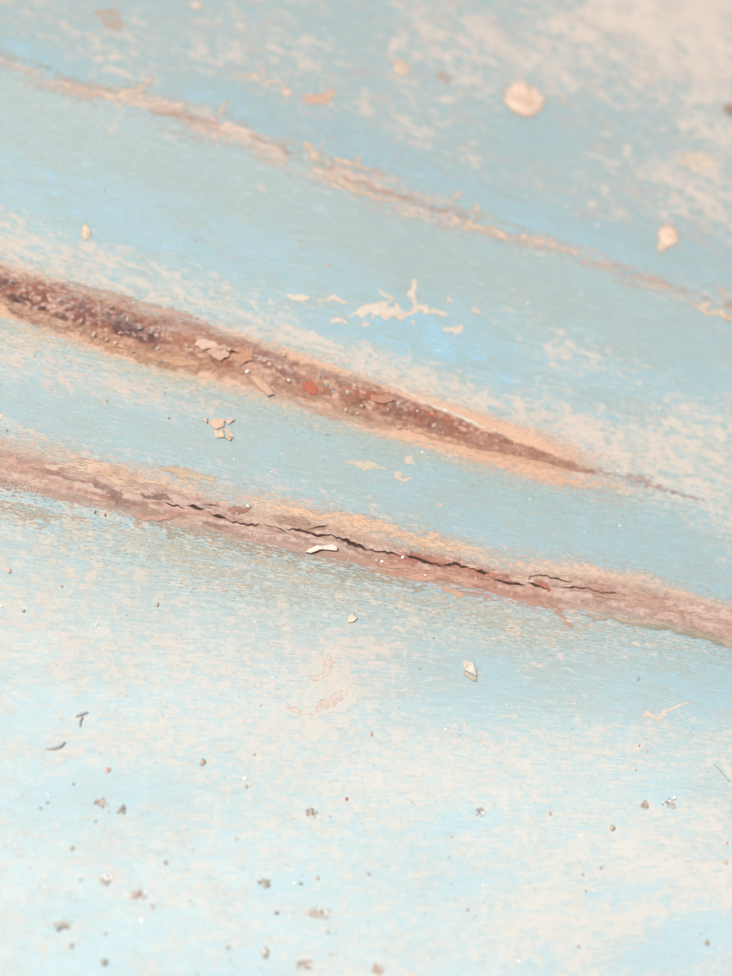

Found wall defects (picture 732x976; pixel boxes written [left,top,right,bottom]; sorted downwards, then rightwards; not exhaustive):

peeling [232,69,338,108]
rust [0,49,732,322]
rust [0,247,704,515]
peeling [285,279,463,335]
rust [0,430,732,652]
crack [163,501,617,594]